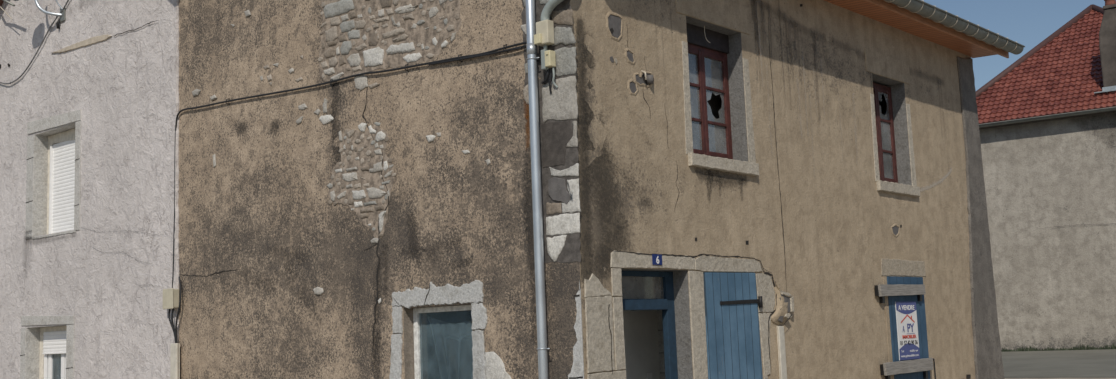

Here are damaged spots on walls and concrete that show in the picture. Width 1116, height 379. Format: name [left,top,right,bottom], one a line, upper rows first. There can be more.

flaking render [318,0,462,91]
flaking render [296,98,396,243]
crack [362,82,396,357]
flaking render [521,0,581,263]
flaking render [485,351,511,379]